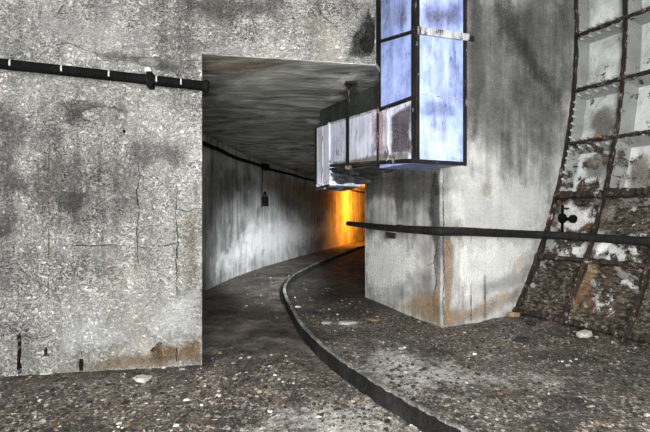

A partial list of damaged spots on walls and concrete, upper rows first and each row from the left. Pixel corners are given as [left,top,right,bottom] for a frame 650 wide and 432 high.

leakage [348,4,376,60]
peeling [592,107,614,136]
peeling [631,157,650,188]
crack [62,165,199,298]
peeling [559,205,589,229]
corrosion [599,203,642,231]
crack [424,176,452,326]
corrosion [444,240,452,325]
corrosion [98,341,200,370]